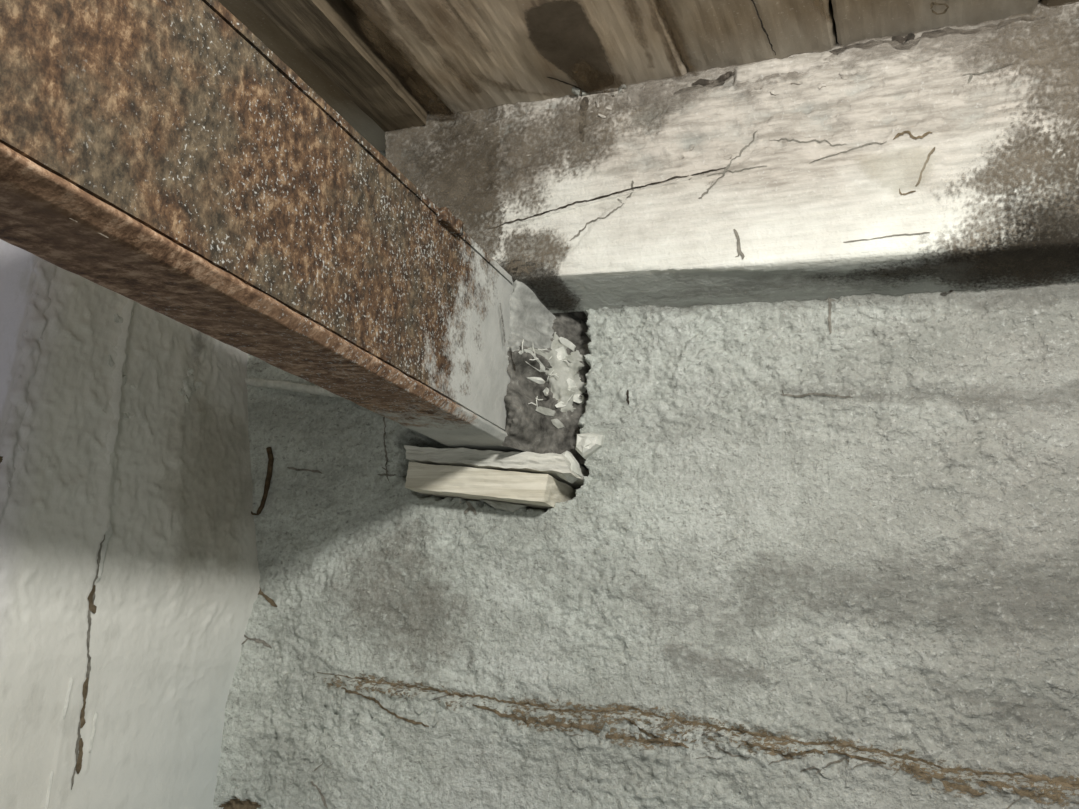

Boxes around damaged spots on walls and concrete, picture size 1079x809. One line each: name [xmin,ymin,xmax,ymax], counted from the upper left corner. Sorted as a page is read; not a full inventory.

leakage [525,0,626,94]
crack [488,131,935,242]
crack [733,229,745,259]
leakage [818,148,1079,288]
spalling [501,280,592,464]
crack [45,522,113,809]
crack [311,672,1079,809]